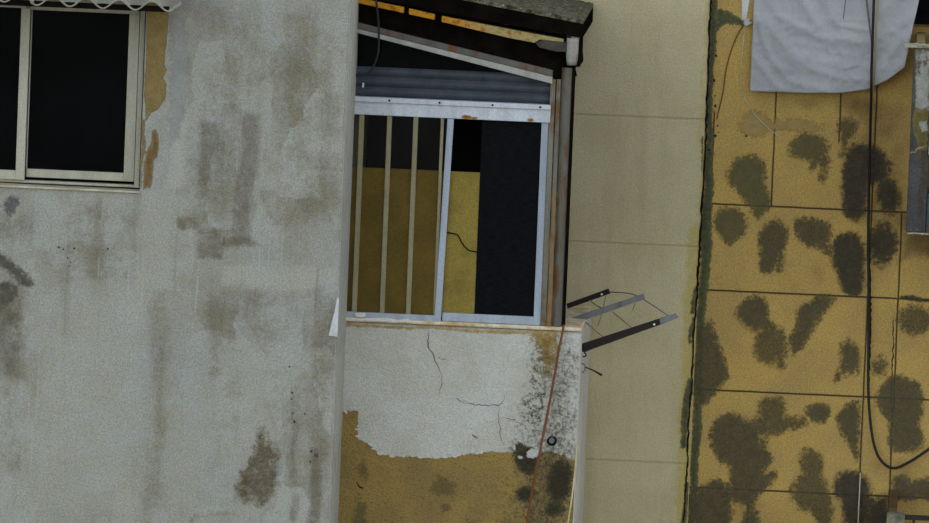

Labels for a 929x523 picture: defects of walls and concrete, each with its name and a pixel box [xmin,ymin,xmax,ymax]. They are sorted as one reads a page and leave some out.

flaking render [144,3,169,120]
peeling [913,48,929,151]
water stain [680,0,902,523]
water stain [897,304,929,337]
water stain [235,431,279,507]
peeling [338,410,575,523]
crack [427,335,522,445]
water stain [506,351,578,523]
water stain [788,447,929,523]
water stain [872,354,926,454]